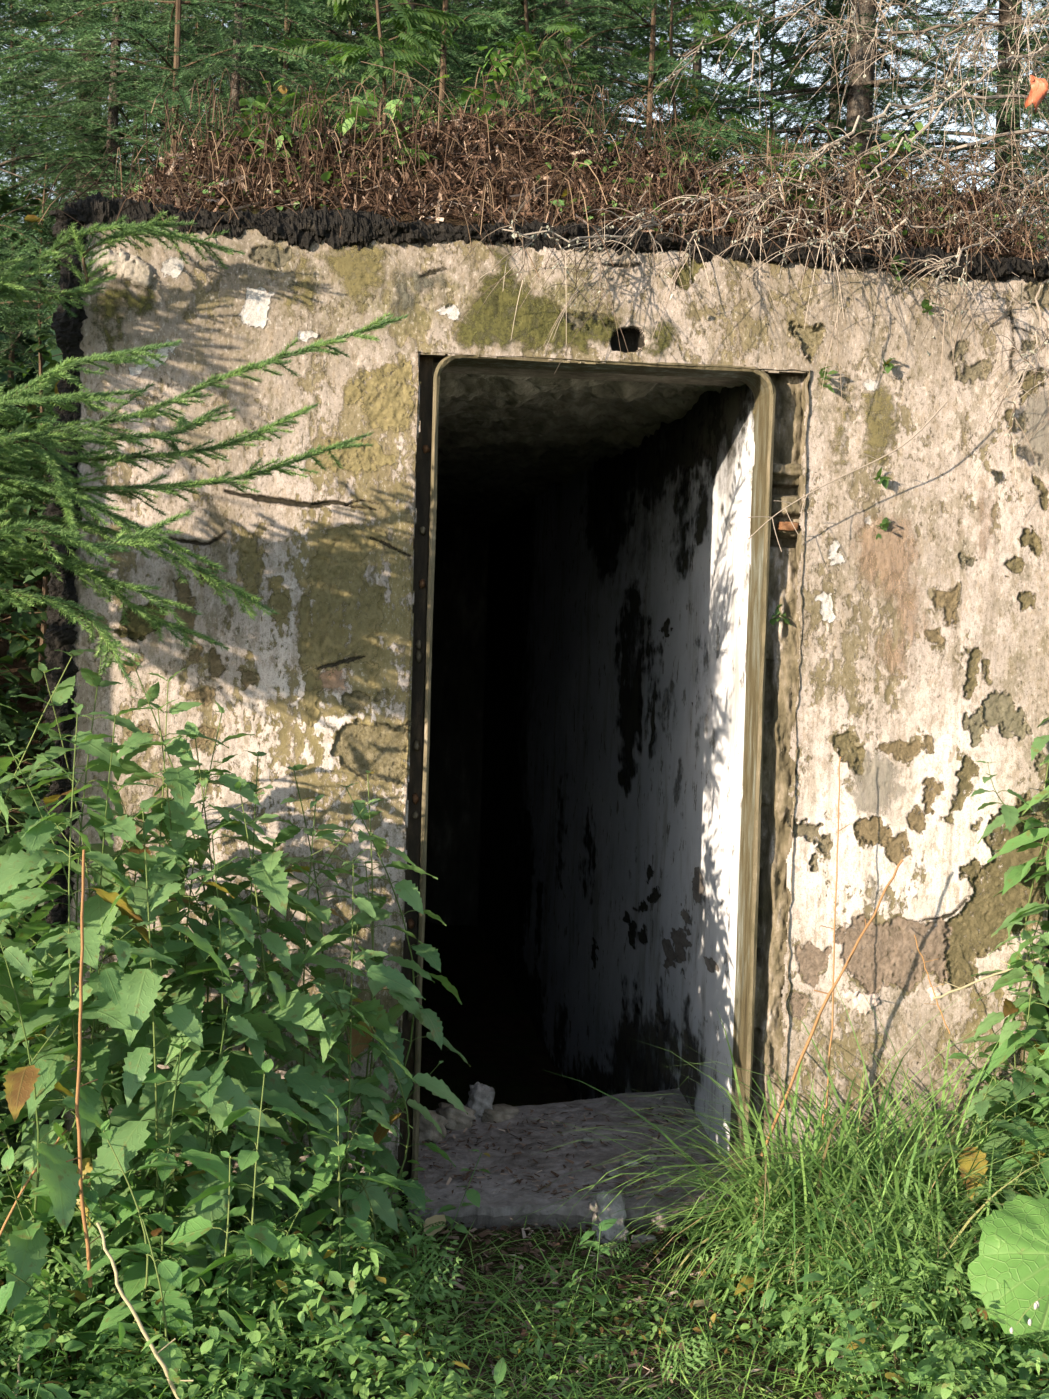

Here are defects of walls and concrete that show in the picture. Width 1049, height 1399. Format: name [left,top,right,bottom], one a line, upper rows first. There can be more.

damp [490,247,516,284]
crack [224,489,411,557]
damp [580,384,756,582]
peeling [1005,526,1042,578]
peeling [239,525,412,785]
crack [317,656,365,670]
damp [614,580,675,797]
damp [674,759,683,816]
peeling [833,724,934,775]
peeling [854,647,1032,865]
damp [514,776,705,1112]
peeling [786,794,1049,1020]